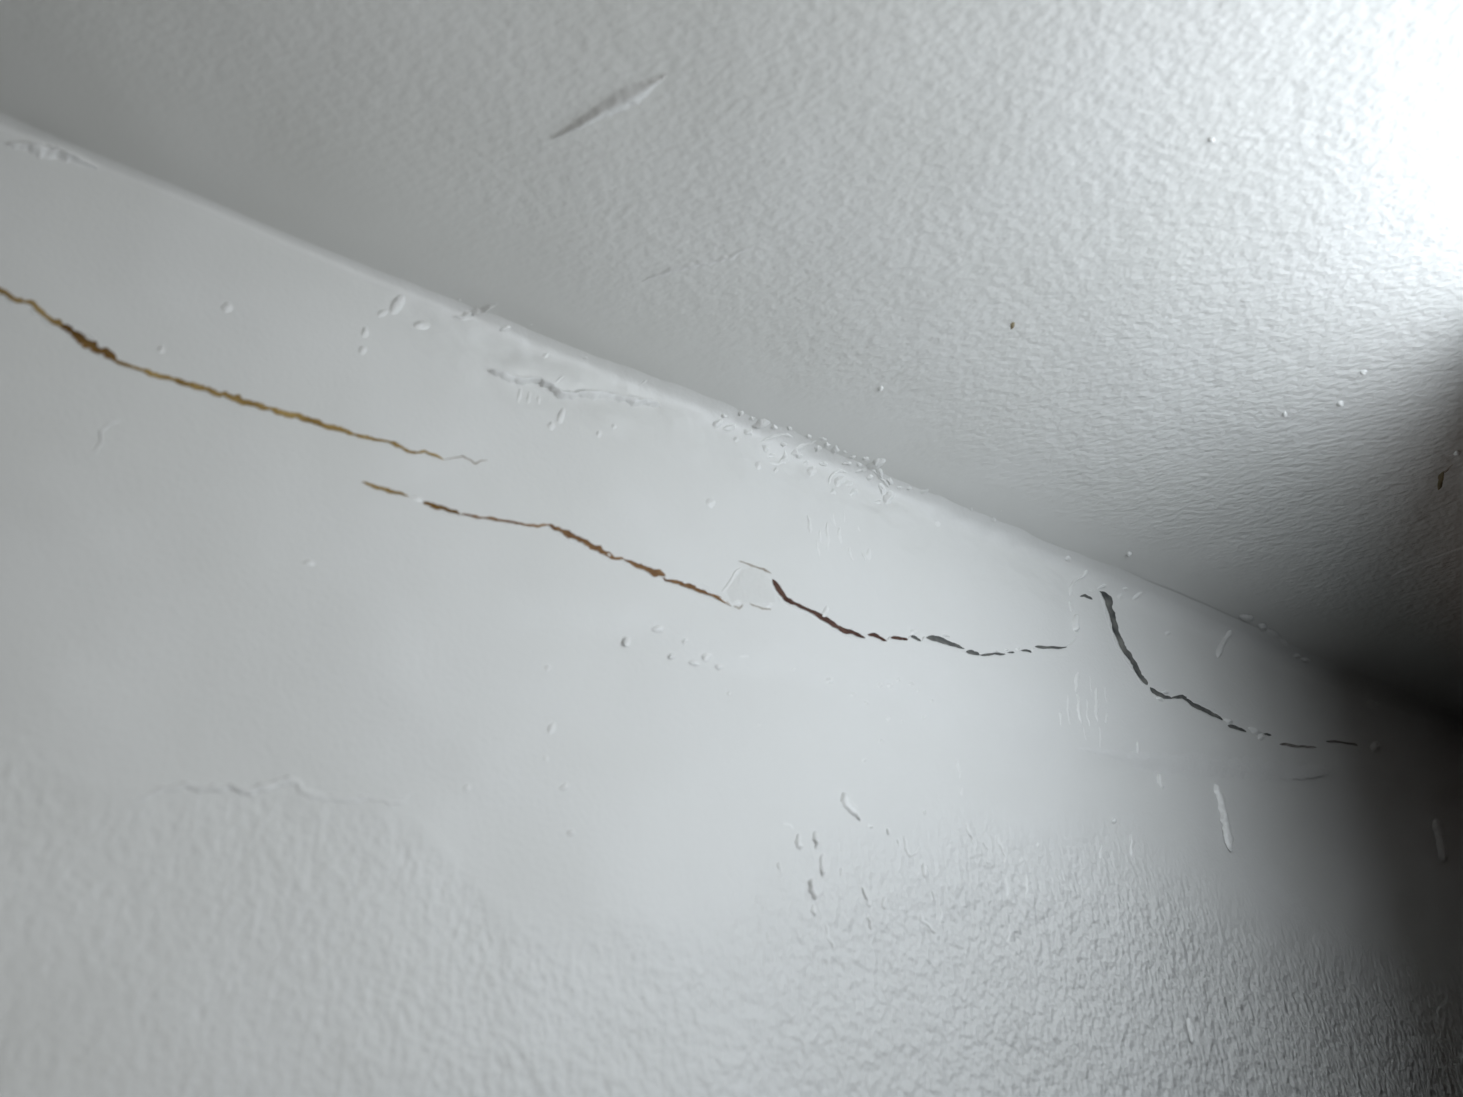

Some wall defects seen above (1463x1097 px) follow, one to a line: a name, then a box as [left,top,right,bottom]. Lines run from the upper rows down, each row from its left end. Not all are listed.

crack [0,287,487,464]
crack [363,481,1066,656]
crack [1080,591,1380,752]